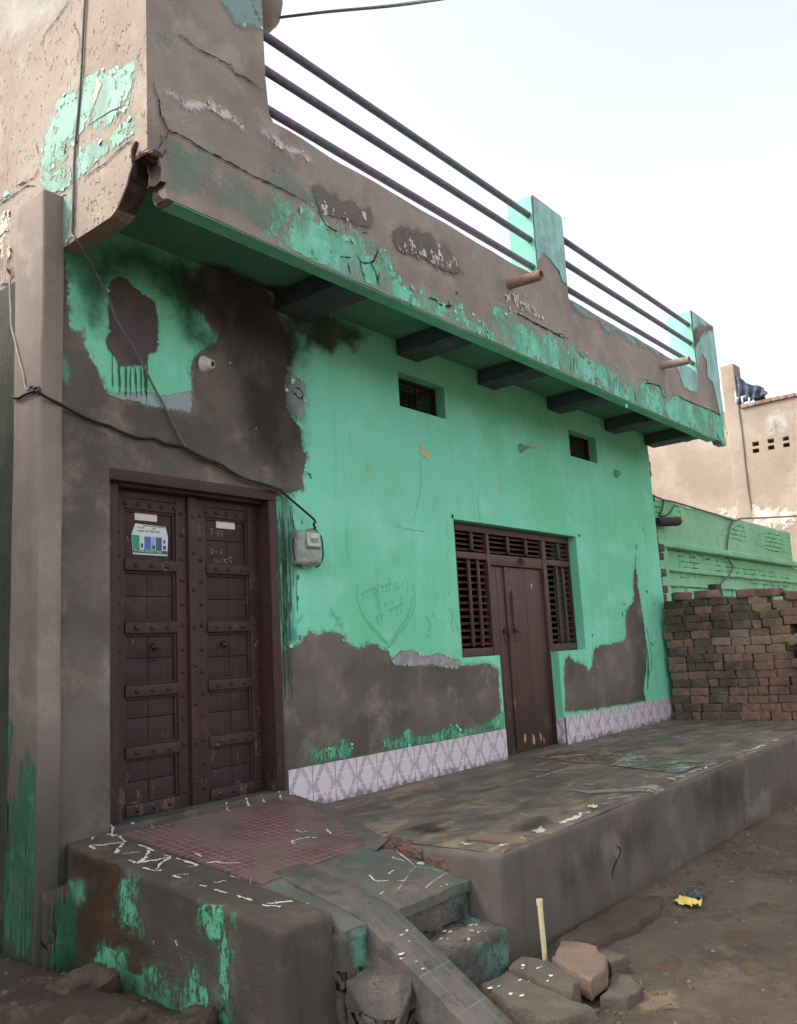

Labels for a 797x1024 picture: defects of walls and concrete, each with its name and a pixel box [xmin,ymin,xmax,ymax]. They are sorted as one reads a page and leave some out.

peeling [25,61,167,243]
crack [178,34,265,92]
crack [153,84,337,232]
crack [341,232,380,284]
peeling [267,185,728,448]
flaking render [59,259,307,886]
damp [274,502,303,701]
flaking render [281,630,502,791]
flaking render [564,545,652,745]